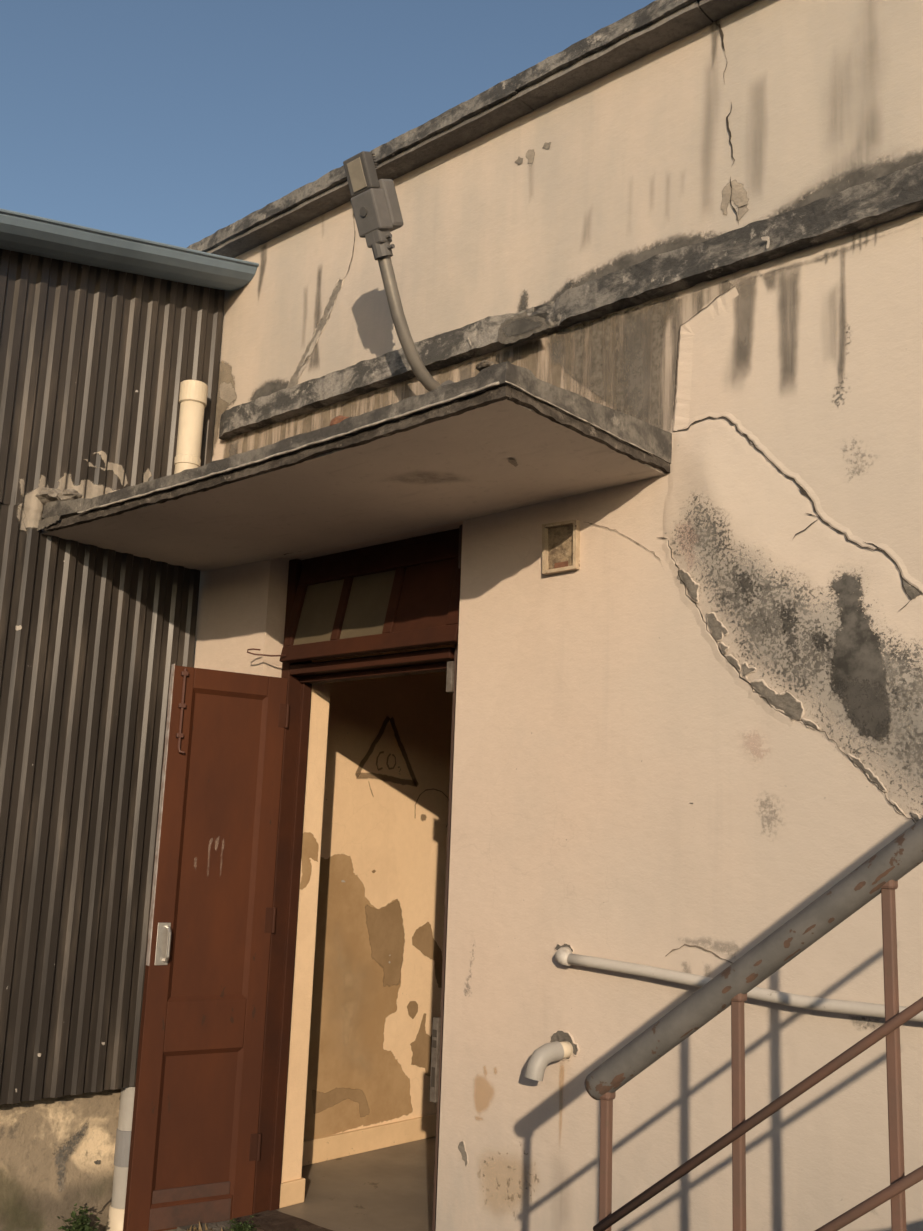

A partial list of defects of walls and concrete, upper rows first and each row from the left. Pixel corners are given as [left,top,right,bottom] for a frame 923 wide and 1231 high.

peeling [721,180,769,221]
water stain [224,290,703,459]
water stain [720,270,797,380]
water stain [834,283,850,406]
spalling [37,384,670,531]
crack [678,412,923,611]
water stain [672,499,923,805]
rust [595,1073,626,1095]
water stain [54,1126,87,1185]